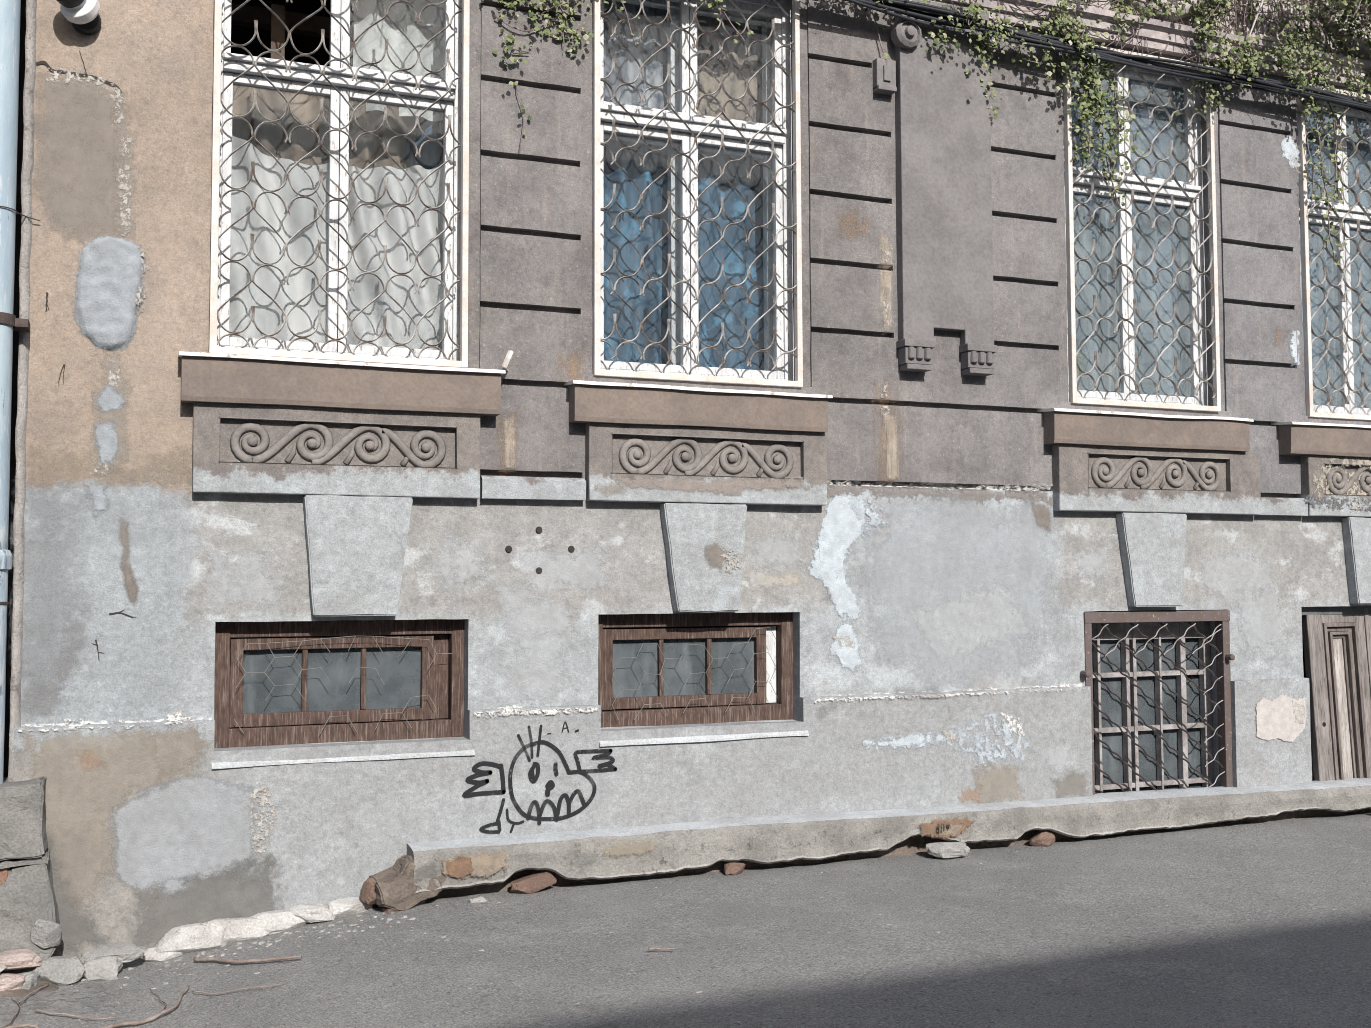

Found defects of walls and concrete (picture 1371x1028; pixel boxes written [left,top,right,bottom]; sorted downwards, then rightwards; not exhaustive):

flaking render [46,67,136,237]
peeling [595,474,810,496]
peeling [1306,456,1371,514]
spalling [705,543,745,573]
peeling [807,479,1053,671]